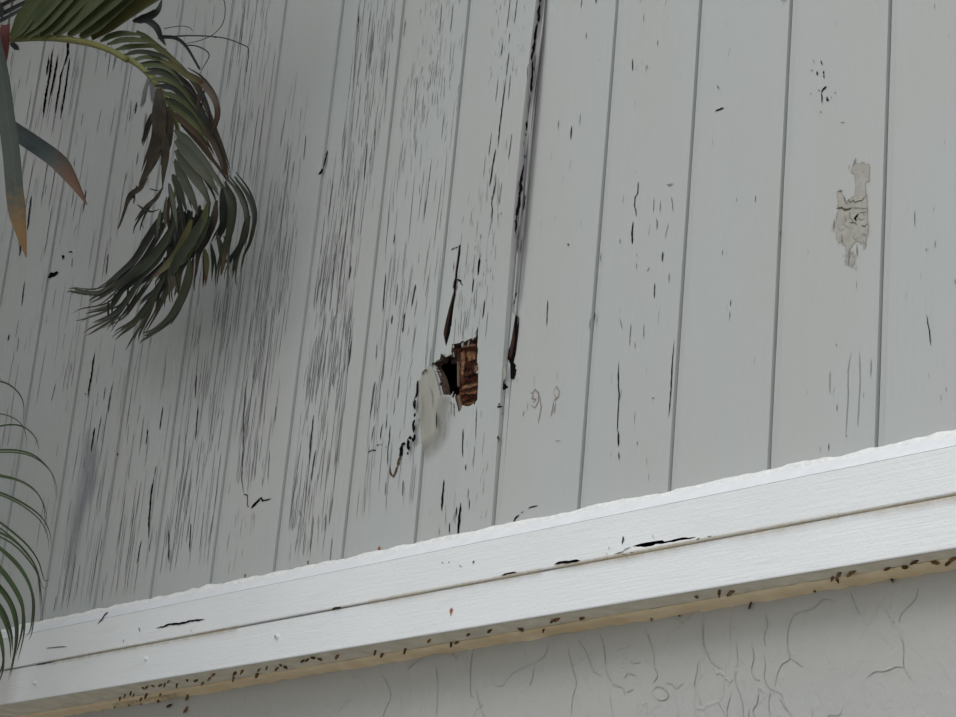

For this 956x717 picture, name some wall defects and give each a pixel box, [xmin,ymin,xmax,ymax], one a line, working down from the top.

peeling [833,158,870,269]
crack [0,0,529,623]
crack [123,619,204,642]
crack [868,588,918,681]